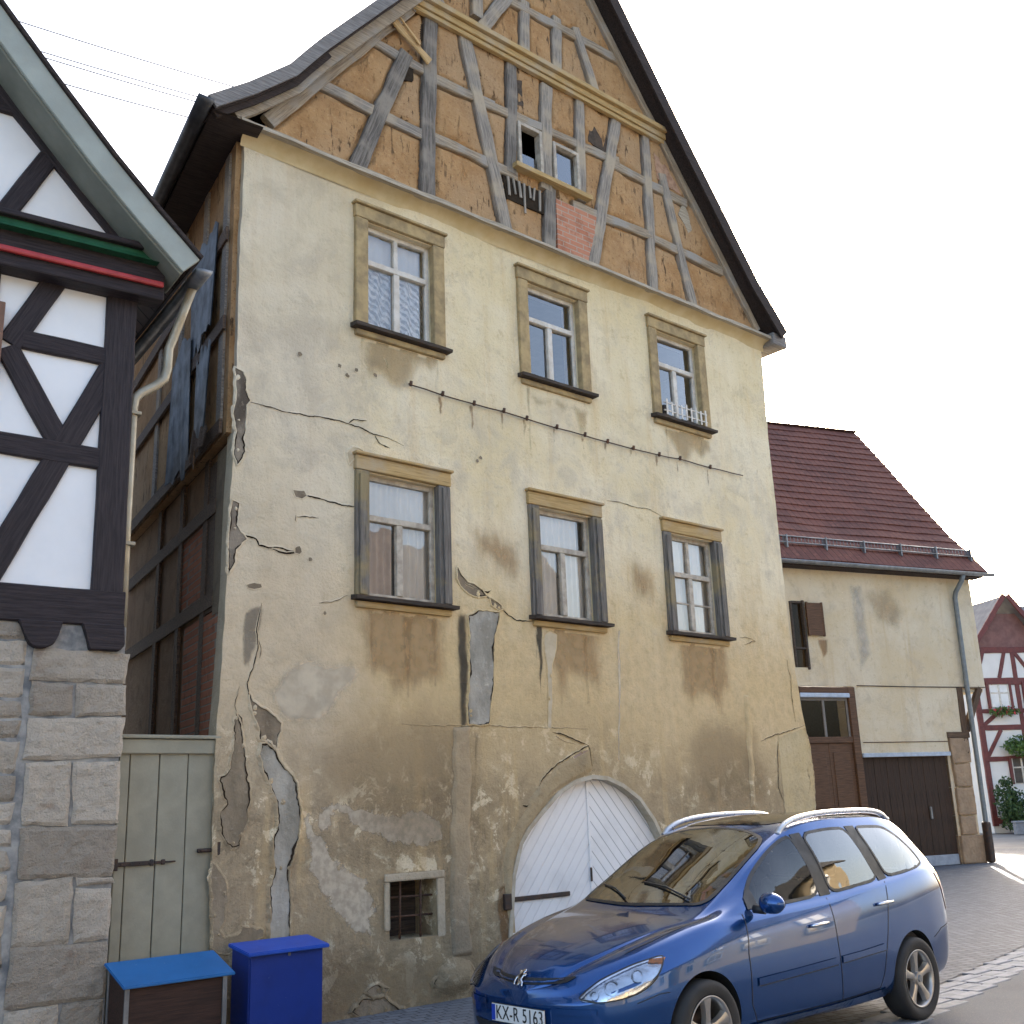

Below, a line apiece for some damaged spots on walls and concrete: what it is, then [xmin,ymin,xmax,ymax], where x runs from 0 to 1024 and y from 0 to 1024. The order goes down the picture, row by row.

spalling [231,366,251,467]
crack [250,402,404,449]
spalling [225,499,248,576]
crack [245,534,294,556]
spalling [455,565,505,727]
peeling [543,631,557,729]
crack [404,723,593,808]
spalling [207,690,304,956]